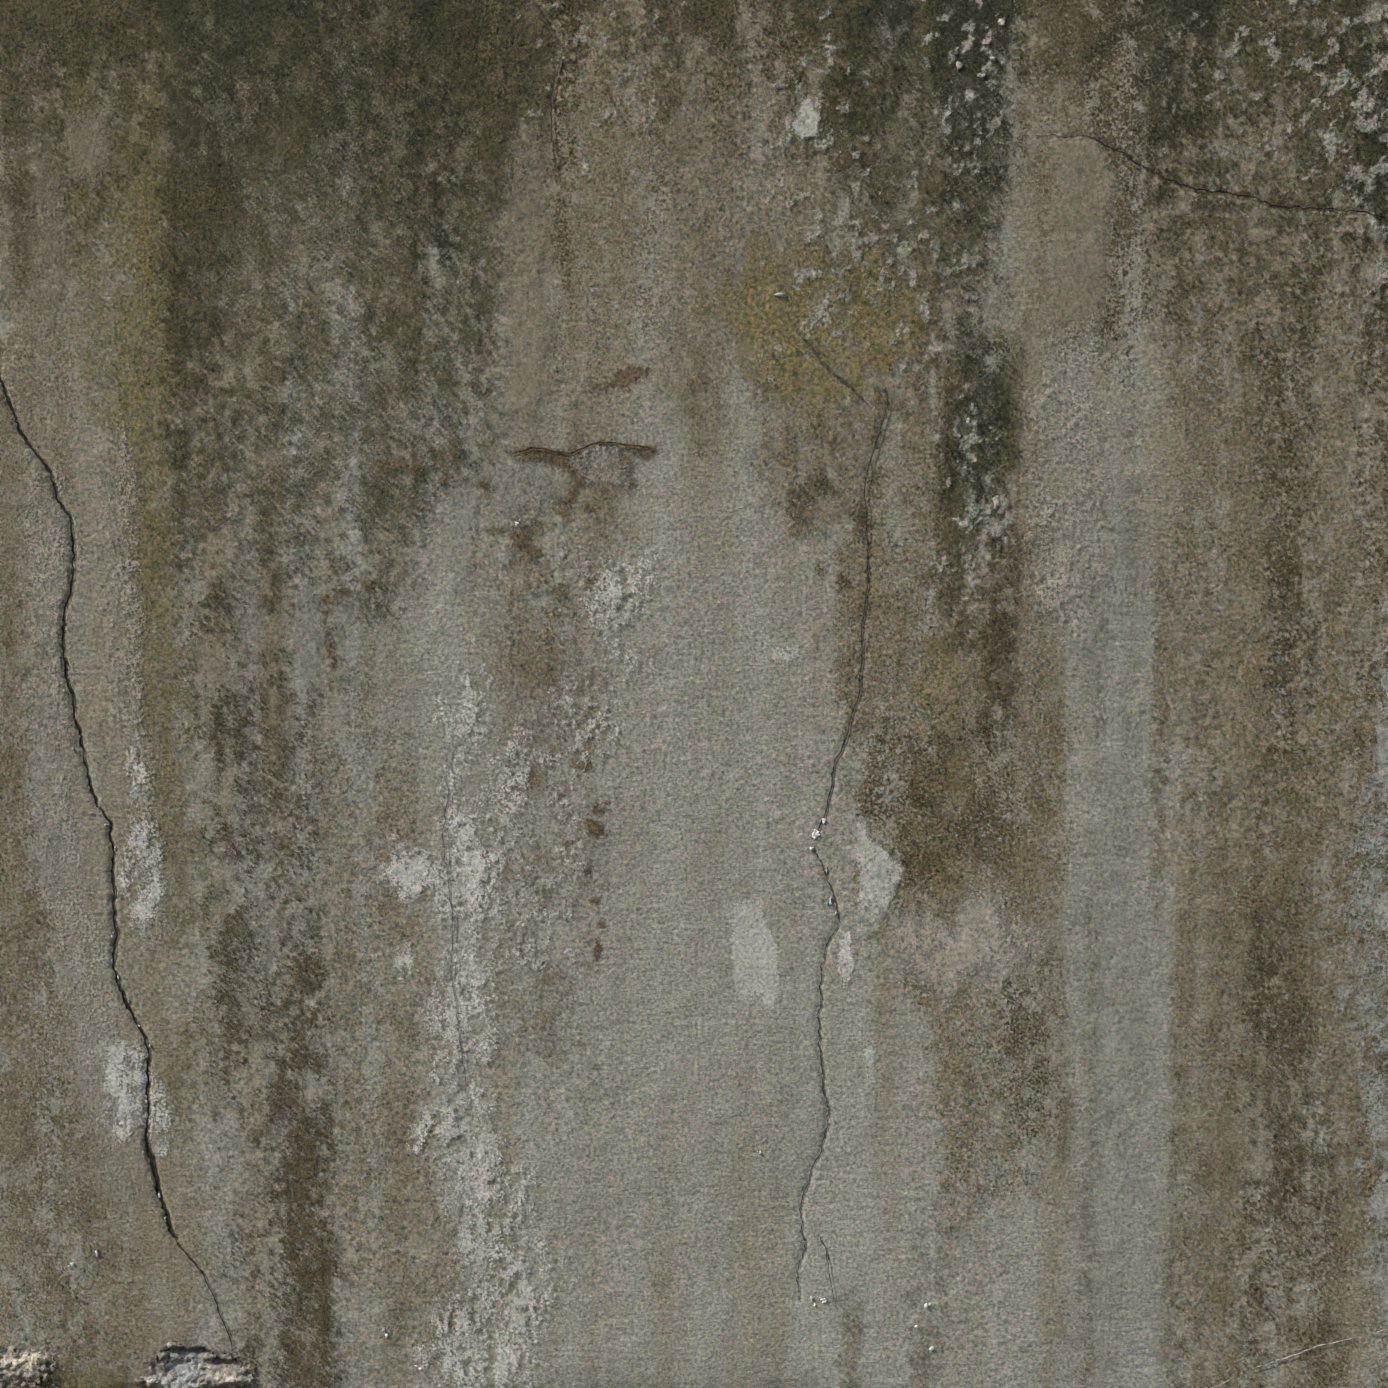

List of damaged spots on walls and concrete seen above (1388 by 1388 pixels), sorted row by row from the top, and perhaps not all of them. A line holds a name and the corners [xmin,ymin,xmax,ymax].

crack [1036,134,1388,221]
rust [592,366,651,392]
rust [504,437,660,522]
rust [484,524,541,561]
water stain [0,0,658,1388]
water stain [506,0,1388,1388]
crack [796,338,888,1297]
crack [0,378,235,1356]
spalling [0,1343,77,1388]
spalling [130,1335,271,1388]